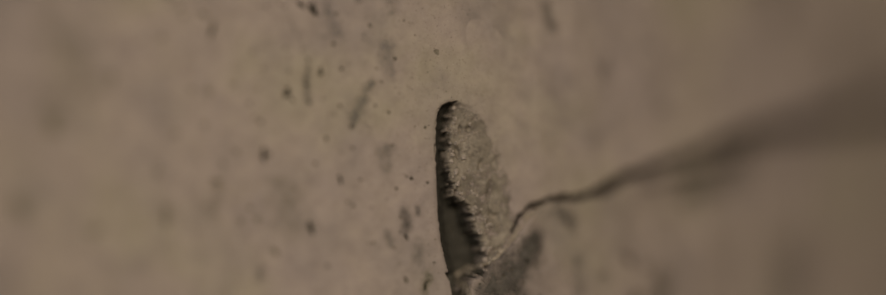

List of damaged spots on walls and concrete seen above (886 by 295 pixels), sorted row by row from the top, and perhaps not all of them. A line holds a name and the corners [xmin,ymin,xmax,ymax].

spalling [443,106,513,271]
crack [434,96,886,295]